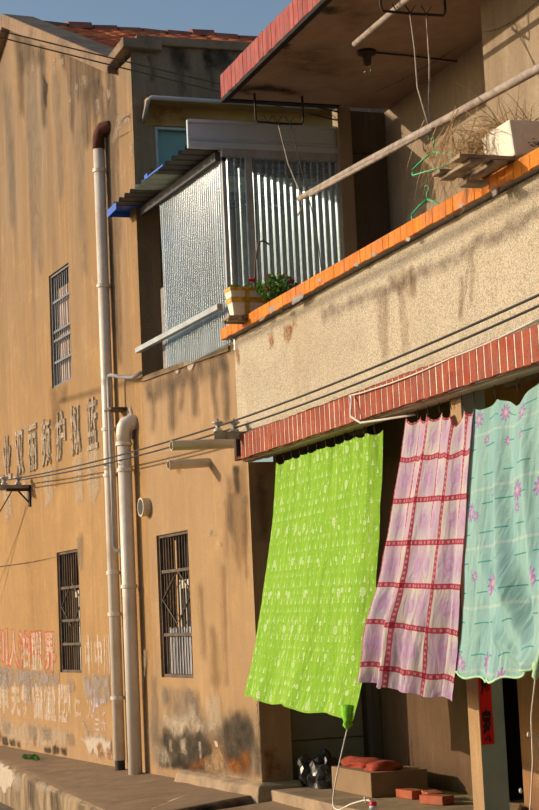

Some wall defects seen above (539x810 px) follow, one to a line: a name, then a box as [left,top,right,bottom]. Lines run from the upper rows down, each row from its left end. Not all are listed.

leakage [17,34,47,124]
leakage [86,65,117,197]
peeling [82,723,111,755]
spalling [205,741,224,770]